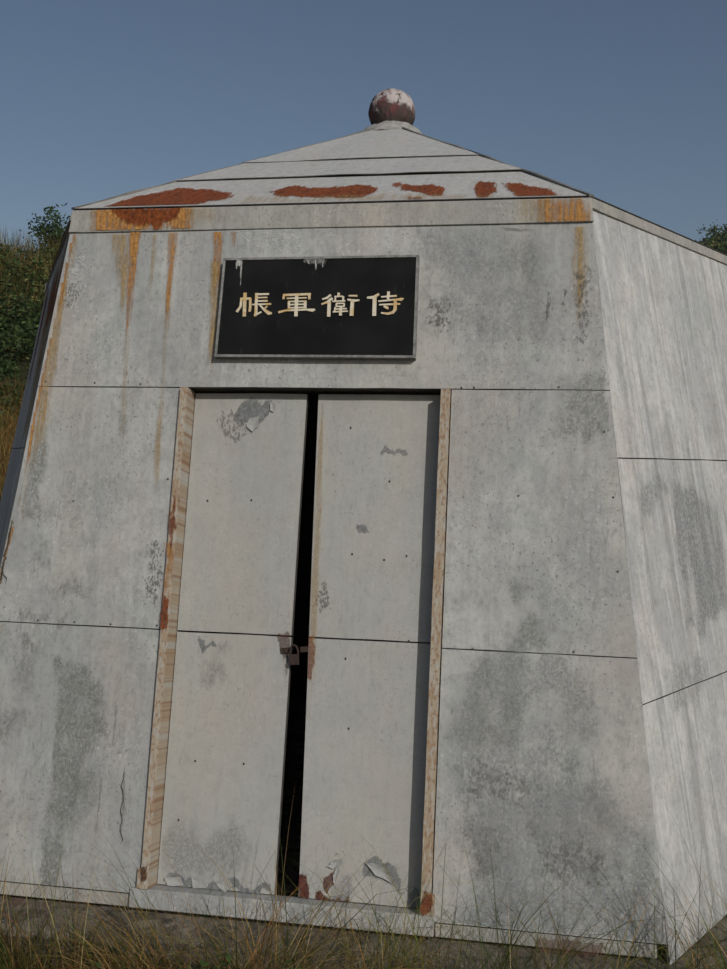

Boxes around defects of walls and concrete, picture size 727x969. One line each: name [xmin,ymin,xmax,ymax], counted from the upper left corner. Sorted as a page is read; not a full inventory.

rust [91,187,234,313]
rust [270,184,378,198]
rust [393,182,445,199]
rust [474,181,592,343]
rust [23,219,76,470]
peeling [235,397,275,431]
rust [160,496,177,629]
leakage [41,658,104,885]
peeling [164,873,271,894]
peeling [363,856,420,909]